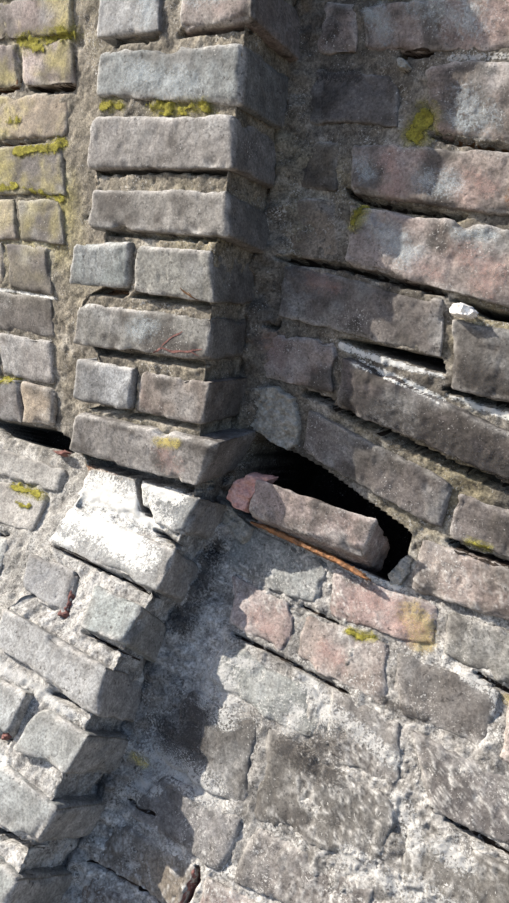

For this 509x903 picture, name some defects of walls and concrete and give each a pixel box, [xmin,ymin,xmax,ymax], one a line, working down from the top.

spalling [226,472,371,582]